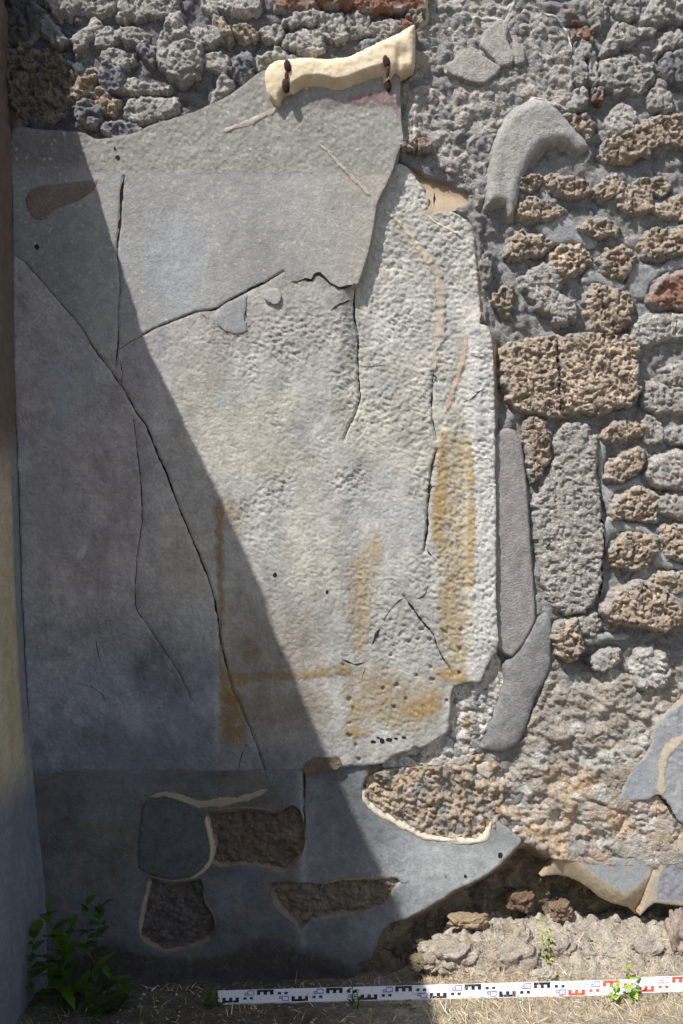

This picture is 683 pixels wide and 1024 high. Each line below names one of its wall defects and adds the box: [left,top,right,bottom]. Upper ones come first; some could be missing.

spalling [410,169,468,218]
crack [318,143,484,558]
crack [27,177,382,781]
water stain [432,467,445,543]
water stain [467,441,475,586]
crack [342,590,453,677]
spalling [210,805,305,868]
spalling [362,753,505,845]
spalling [138,879,216,949]
spalling [270,877,398,927]